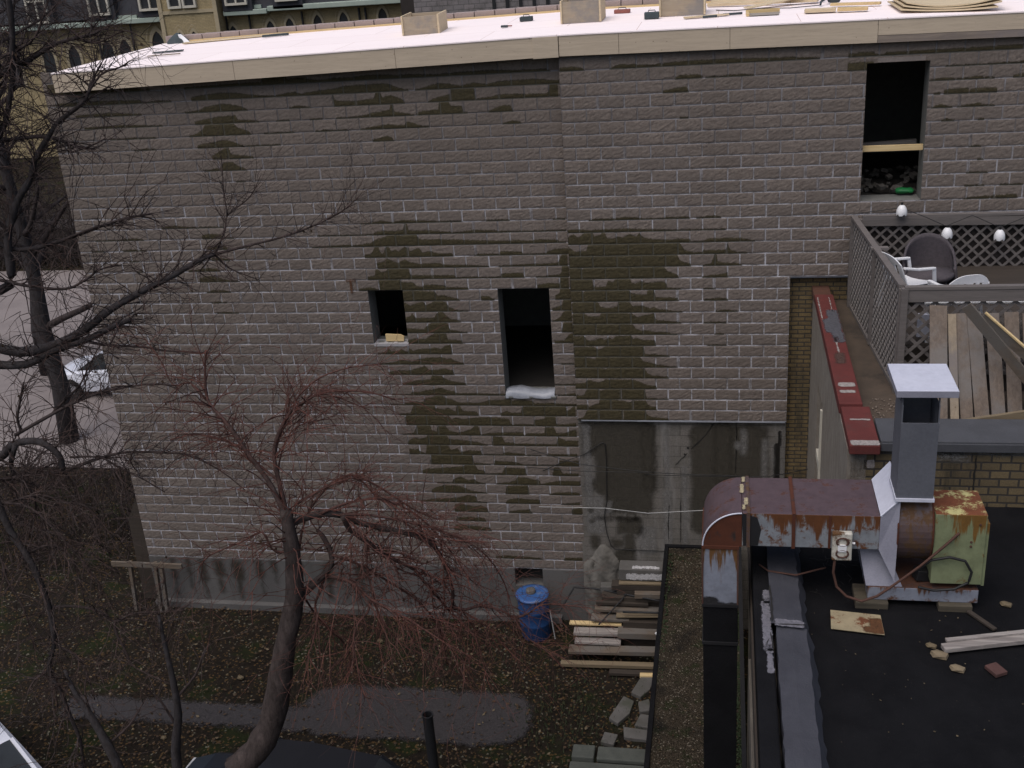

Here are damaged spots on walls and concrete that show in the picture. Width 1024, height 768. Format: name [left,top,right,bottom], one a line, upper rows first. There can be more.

water stain [184,67,585,182]
water stain [610,56,820,94]
water stain [312,215,768,562]